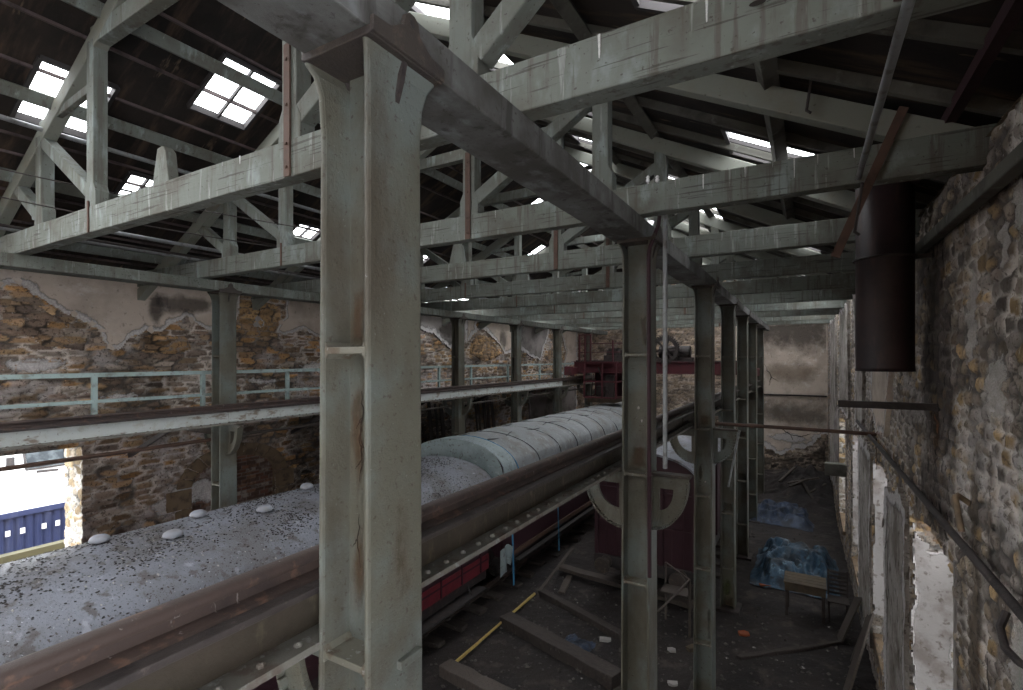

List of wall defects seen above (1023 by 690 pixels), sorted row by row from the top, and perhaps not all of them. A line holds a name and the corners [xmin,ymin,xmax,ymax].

peeling [0,269,212,351]
leakage [150,295,208,321]
peeling [274,300,320,338]
peeling [421,315,452,349]
peeling [464,320,550,360]
peeling [562,331,578,366]
crack [355,391,365,482]
peeling [764,294,953,690]